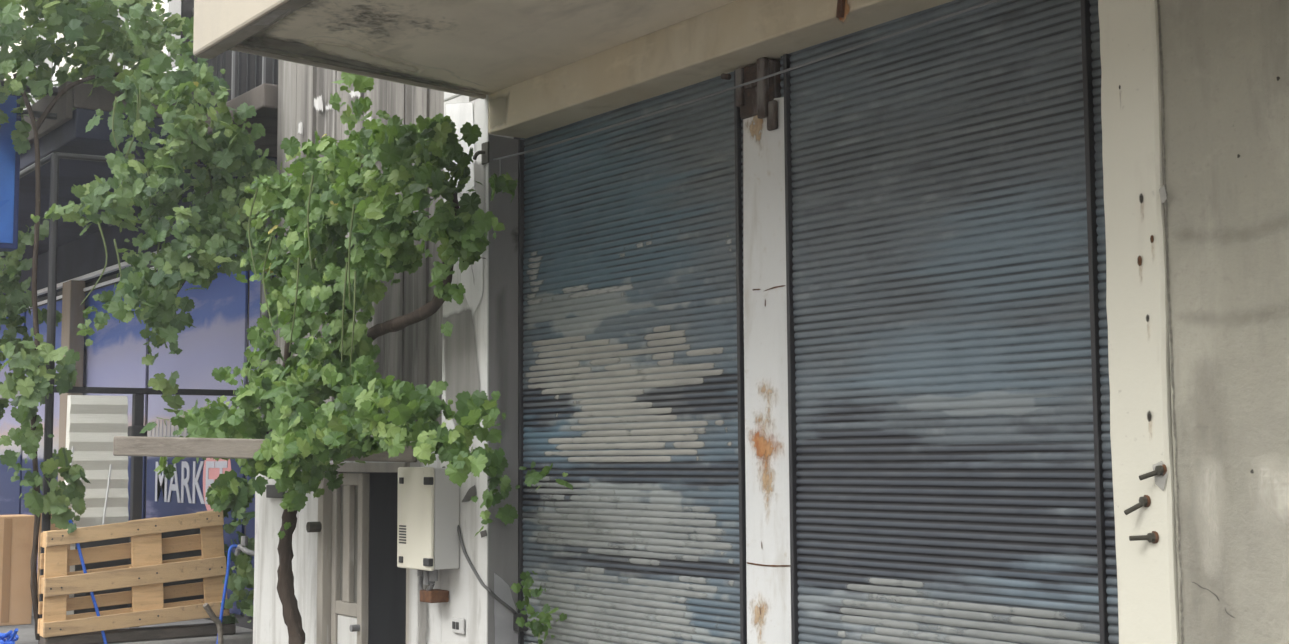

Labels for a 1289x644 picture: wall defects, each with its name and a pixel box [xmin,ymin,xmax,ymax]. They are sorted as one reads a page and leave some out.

crack [1158,0,1233,643]
corrosion [751,385,782,501]
corrosion [754,602,767,635]